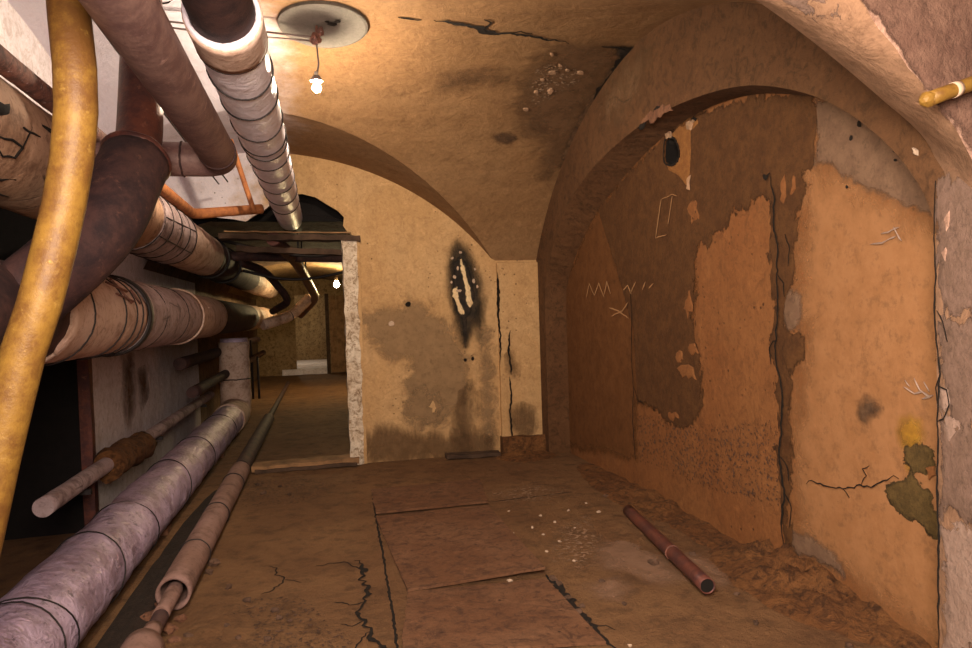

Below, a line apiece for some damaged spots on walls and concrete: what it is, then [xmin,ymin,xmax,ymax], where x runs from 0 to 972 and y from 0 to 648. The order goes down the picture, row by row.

crack [398,17,569,44]
peeling [861,0,972,91]
damp [363,303,495,463]
crack [496,273,513,436]
peeling [566,91,972,648]
crack [762,173,899,544]
crack [316,498,399,648]